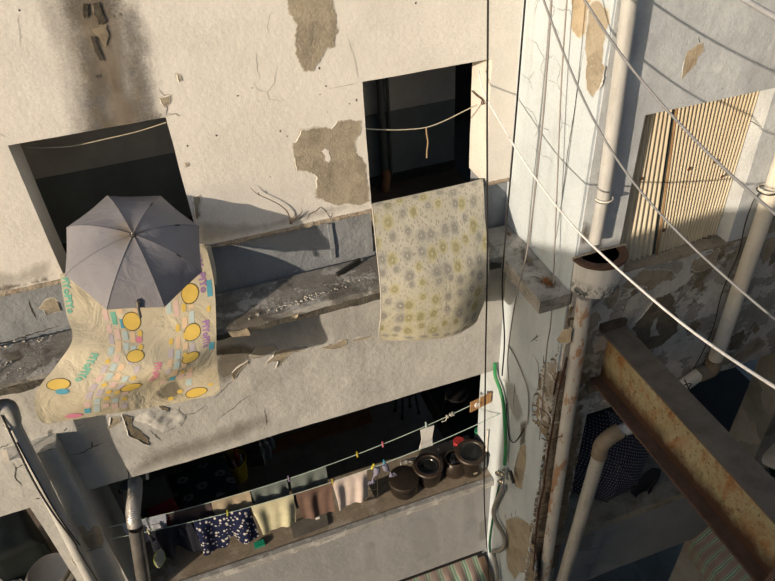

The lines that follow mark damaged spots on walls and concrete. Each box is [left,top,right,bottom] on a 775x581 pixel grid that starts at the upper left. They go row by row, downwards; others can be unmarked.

damp [62,0,157,131]
peeling [287,0,339,72]
crack [524,0,583,213]
peeling [571,0,610,98]
peeling [680,41,704,79]
peeling [292,119,370,206]
peeling [691,248,720,272]
peeling [231,343,308,381]
peeling [587,268,680,350]
peeling [722,329,766,365]
peeling [107,414,150,445]
spalling [505,320,589,581]